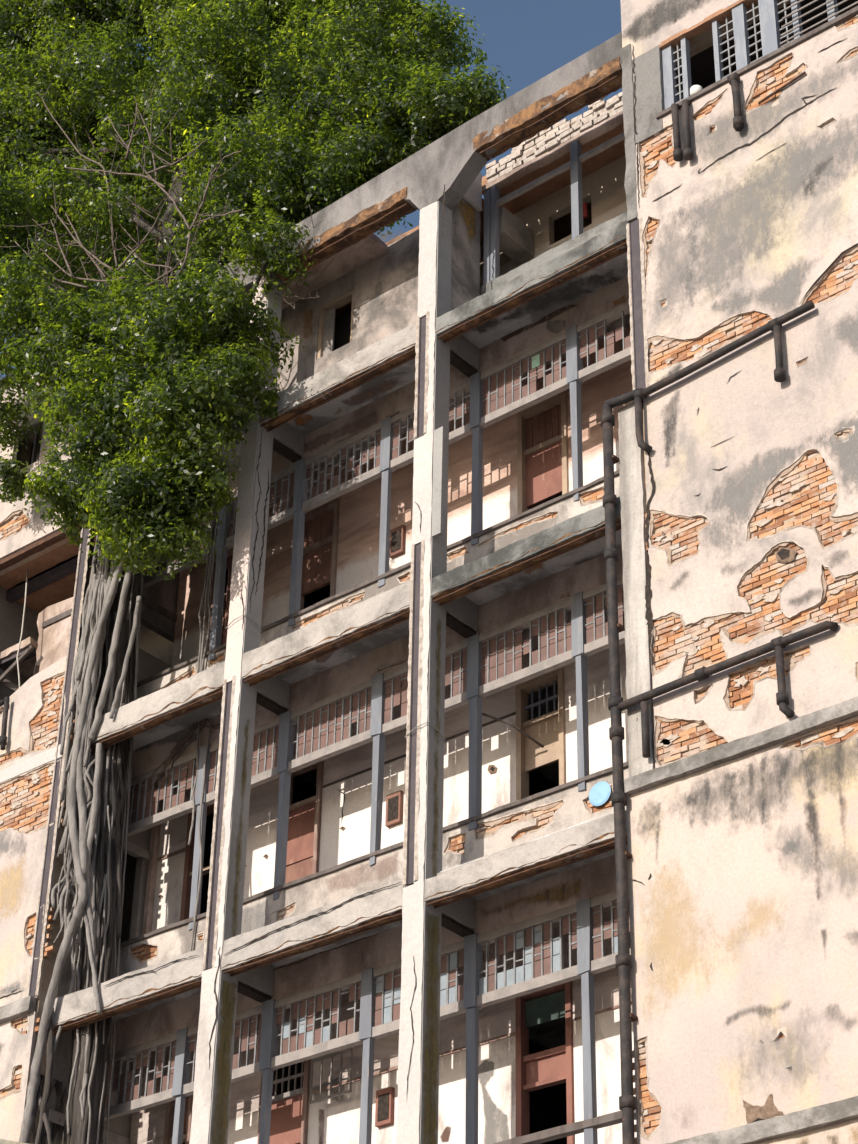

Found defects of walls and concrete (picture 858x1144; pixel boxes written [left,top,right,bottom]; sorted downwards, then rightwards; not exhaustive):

spalling [743,52,808,112]
spalling [638,124,677,198]
spalling [800,245,858,306]
spalling [259,216,774,452]
crack [241,429,269,630]
spalling [645,448,858,711]
spalling [0,520,95,997]
spalling [53,511,627,1036]
spalling [653,715,729,767]
water stain [689,745,858,817]
spalling [632,1036,663,1144]
spalling [742,1094,784,1124]